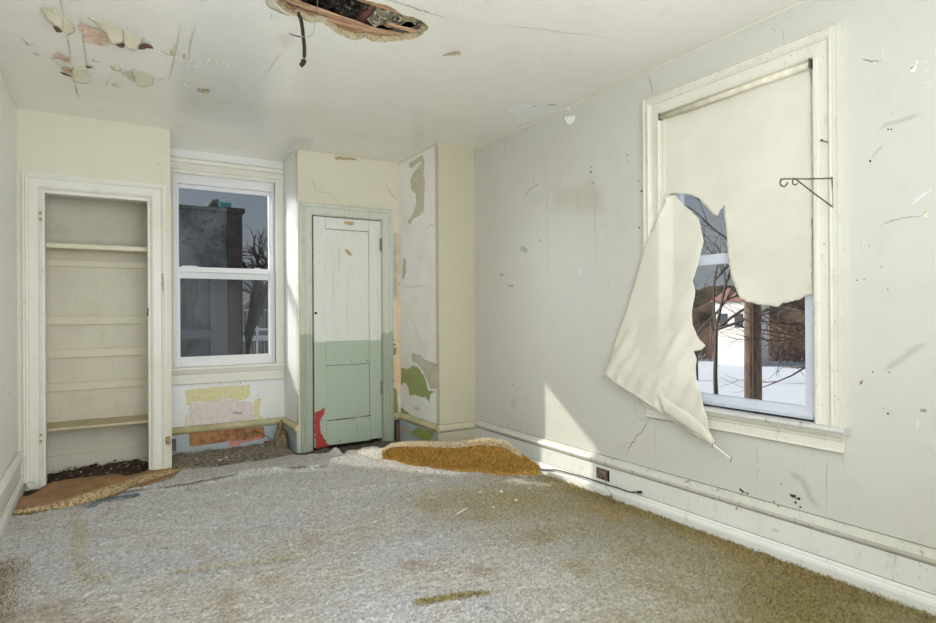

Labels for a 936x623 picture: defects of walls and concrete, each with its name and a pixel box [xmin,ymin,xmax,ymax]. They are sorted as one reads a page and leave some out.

flaking render [40,8,225,75]
peeling [266,0,292,16]
spalling [371,22,417,30]
flaking render [51,53,97,84]
flaking render [105,65,209,94]
peeling [408,155,425,224]
peeling [393,233,439,415]
peeling [184,385,272,447]
peeling [313,408,371,449]
peeling [402,425,433,441]